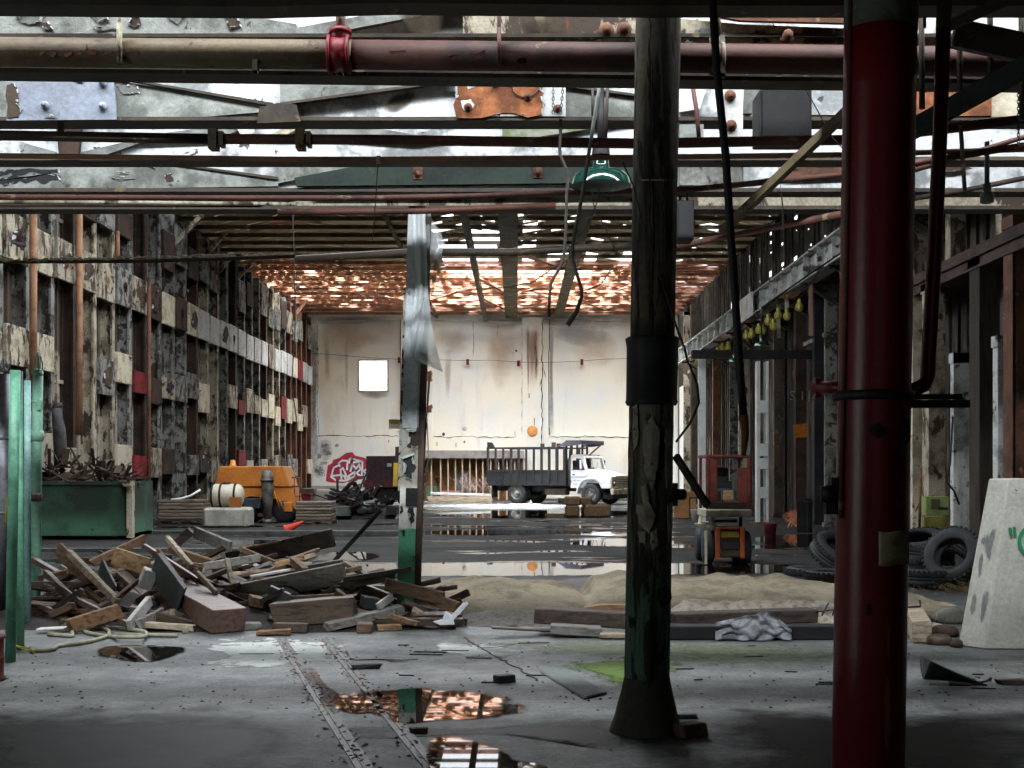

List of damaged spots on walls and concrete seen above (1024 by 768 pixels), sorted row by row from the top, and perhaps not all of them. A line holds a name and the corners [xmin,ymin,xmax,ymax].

peeling [15,16,54,30]
peeling [93,17,141,30]
peeling [225,18,242,30]
peeling [5,83,22,118]
peeling [118,84,140,95]
rust [453,86,545,118]
peeling [0,168,62,187]
peeling [11,227,28,251]
peeling [136,283,161,314]
peeling [102,366,113,388]
peeling [632,405,673,550]
peeling [656,586,672,608]